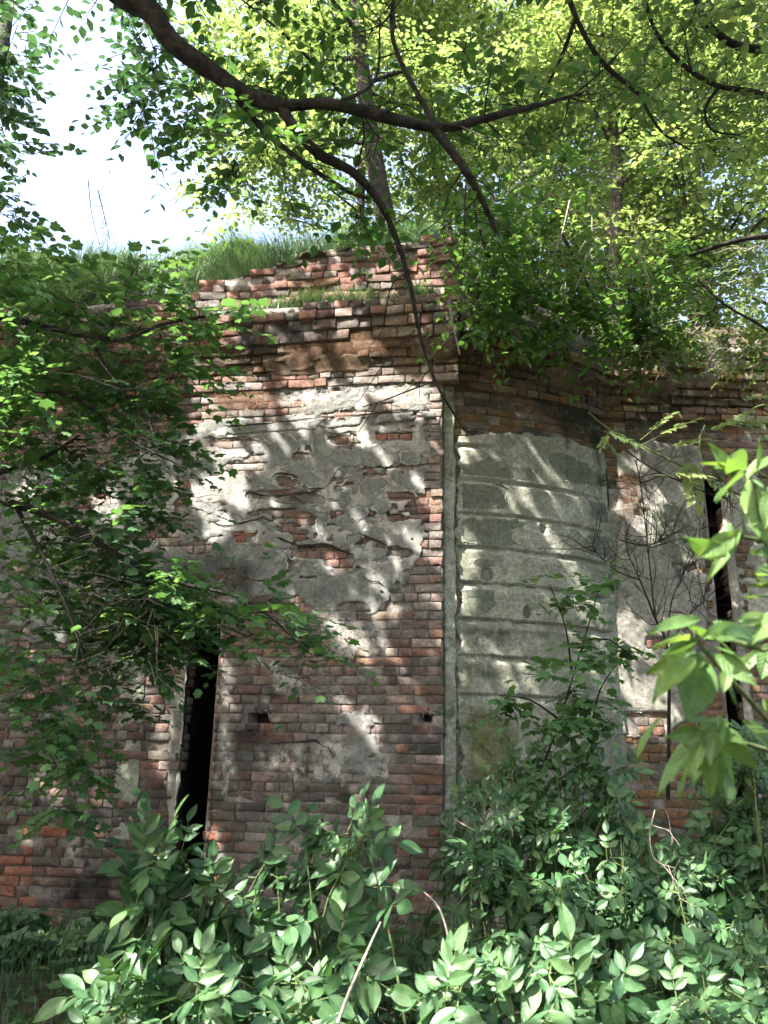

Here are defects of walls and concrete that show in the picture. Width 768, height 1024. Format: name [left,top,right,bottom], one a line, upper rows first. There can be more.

peeling [233,428,418,581]